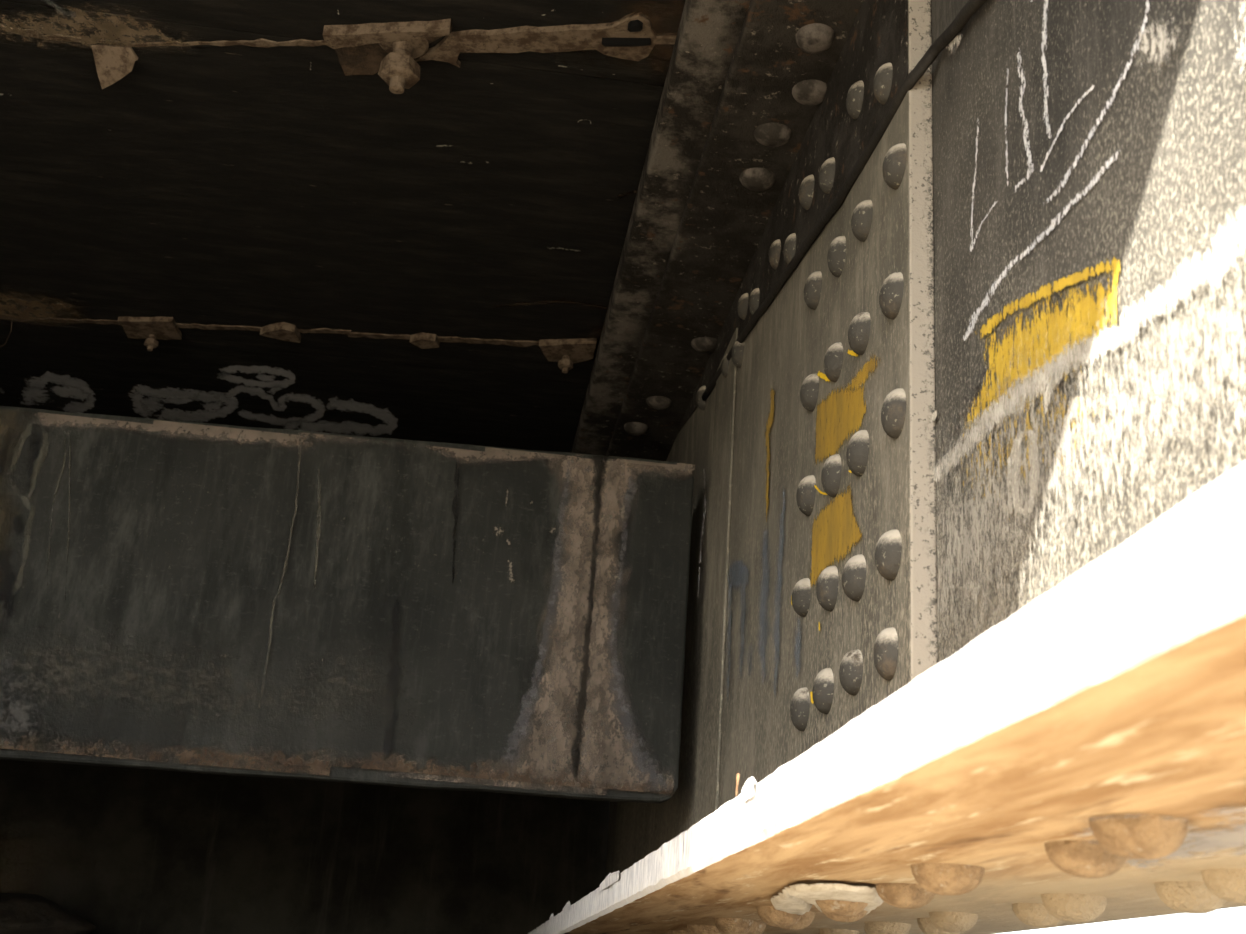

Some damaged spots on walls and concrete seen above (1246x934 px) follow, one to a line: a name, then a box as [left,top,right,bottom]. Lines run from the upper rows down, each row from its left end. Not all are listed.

rust [0,2,191,48]
water stain [0,409,405,756]
rust [0,456,691,795]
water stain [424,445,583,764]
crack [571,455,608,778]
water stain [607,458,706,791]